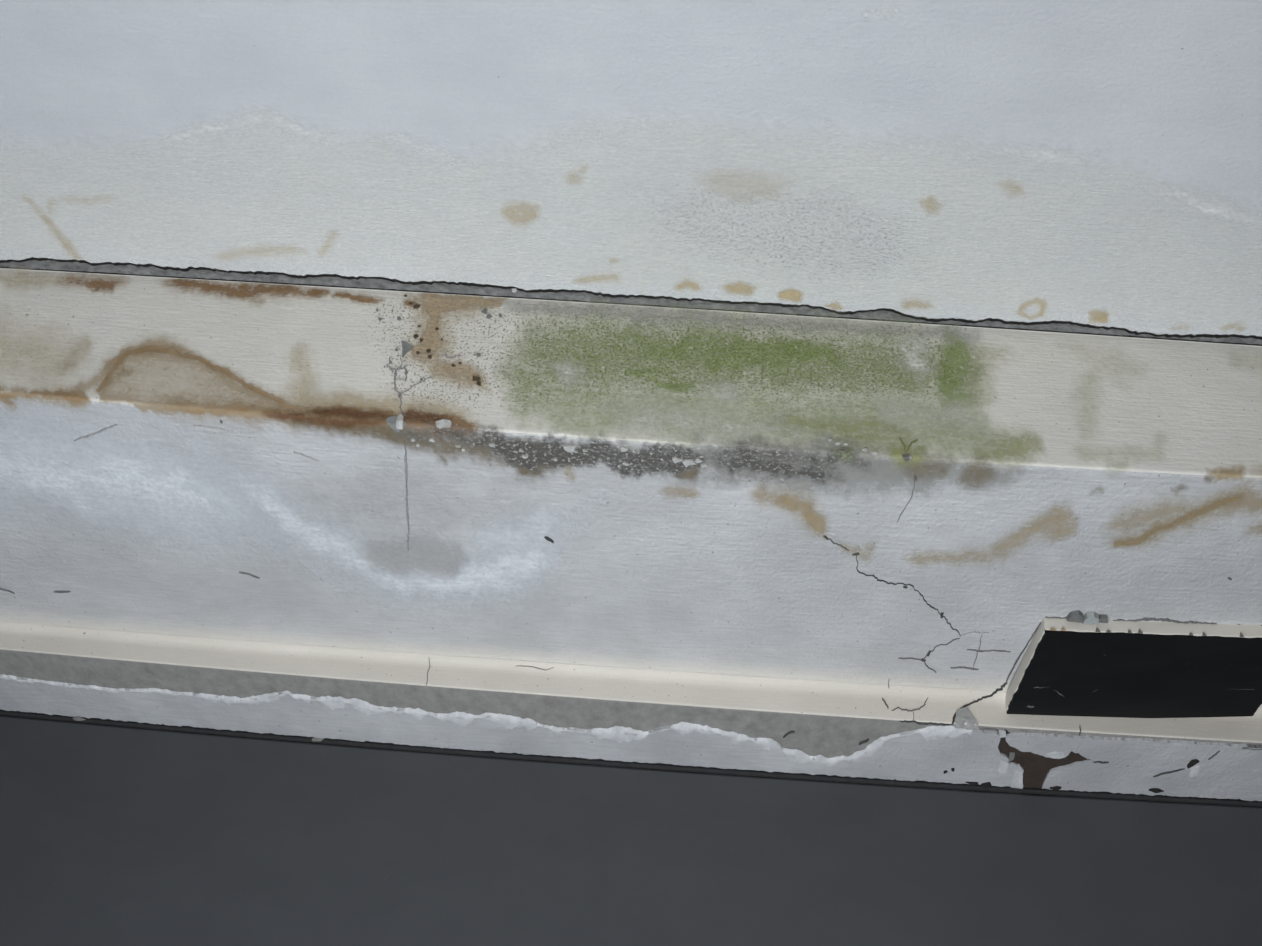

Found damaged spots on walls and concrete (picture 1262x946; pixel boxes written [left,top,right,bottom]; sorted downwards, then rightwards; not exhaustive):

crack [0,257,1262,345]
damp [0,340,559,601]
damp [372,425,1012,534]
rust [1214,470,1242,479]
crack [823,535,1067,732]
crack [1113,617,1262,626]
peeling [0,674,1262,801]